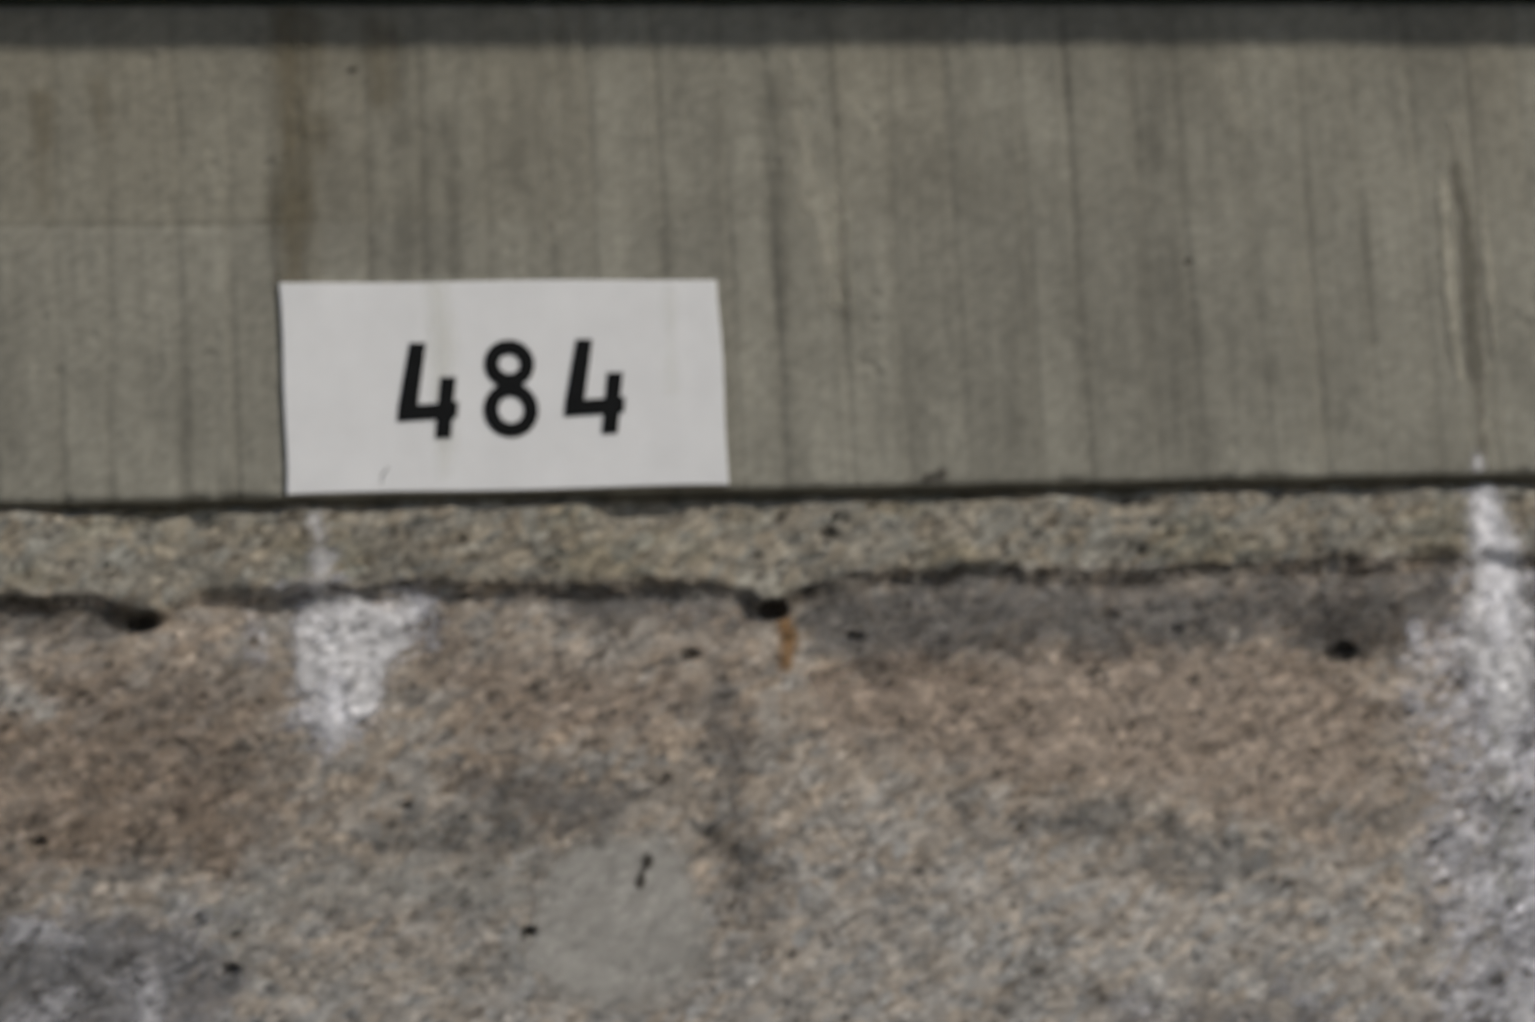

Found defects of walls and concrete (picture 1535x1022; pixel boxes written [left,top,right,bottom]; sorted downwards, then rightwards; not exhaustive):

water stain [1439,176,1462,380]
rust [778,616,797,670]
water stain [802,455,1535,1022]